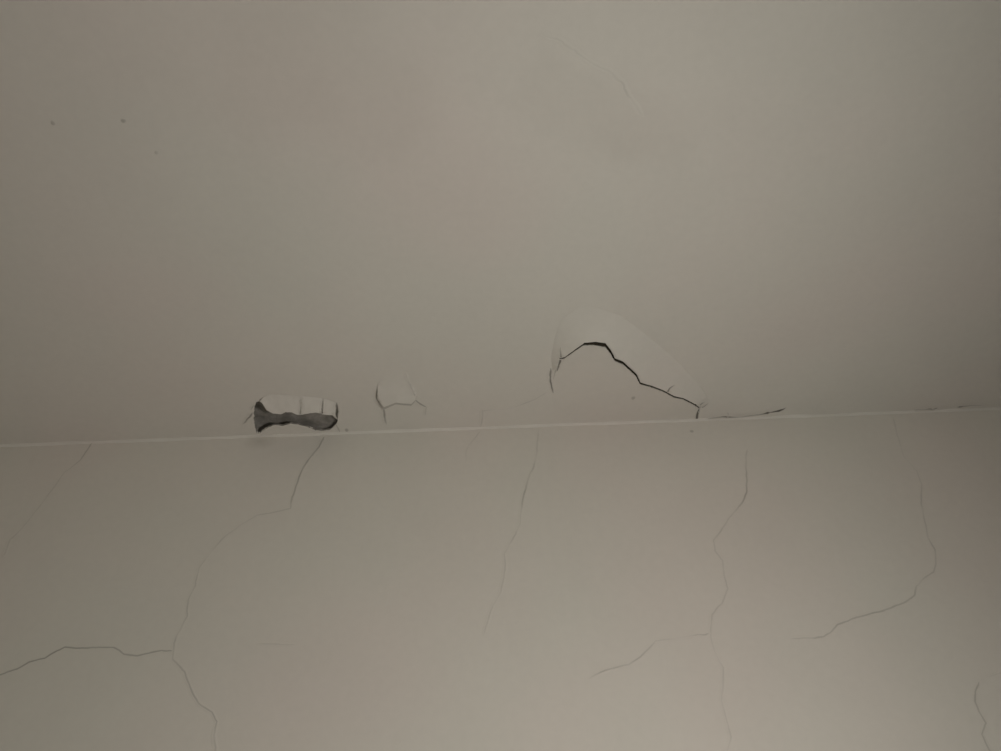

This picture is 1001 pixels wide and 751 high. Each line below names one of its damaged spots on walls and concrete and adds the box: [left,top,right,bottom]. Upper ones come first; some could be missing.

spalling [242,394,342,432]
crack [0,437,326,751]